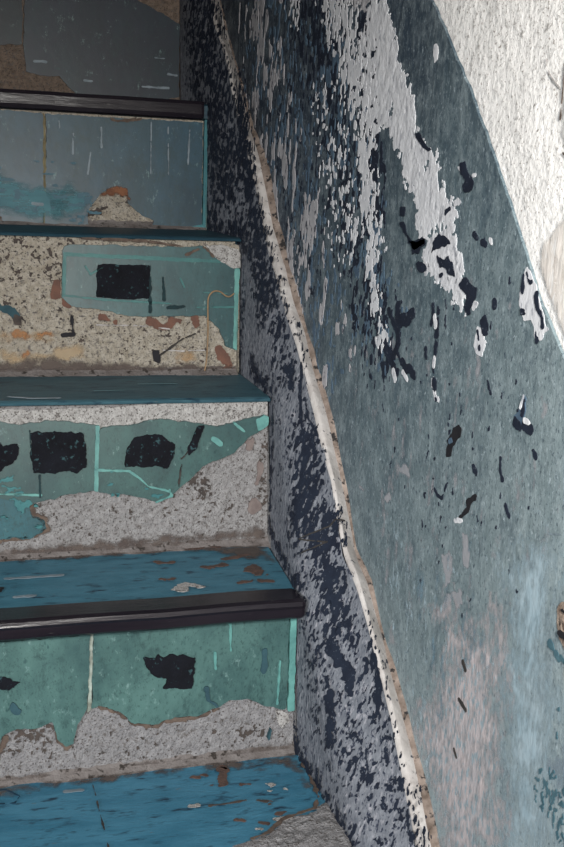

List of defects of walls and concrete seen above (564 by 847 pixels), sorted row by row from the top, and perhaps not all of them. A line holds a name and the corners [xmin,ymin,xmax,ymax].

spalling [0,0,479,797]
peeling [472,231,493,248]
peeling [469,298,497,376]
flaking render [509,221,564,344]
peeling [412,544,511,847]
spalling [0,686,360,847]
peeling [373,776,432,847]